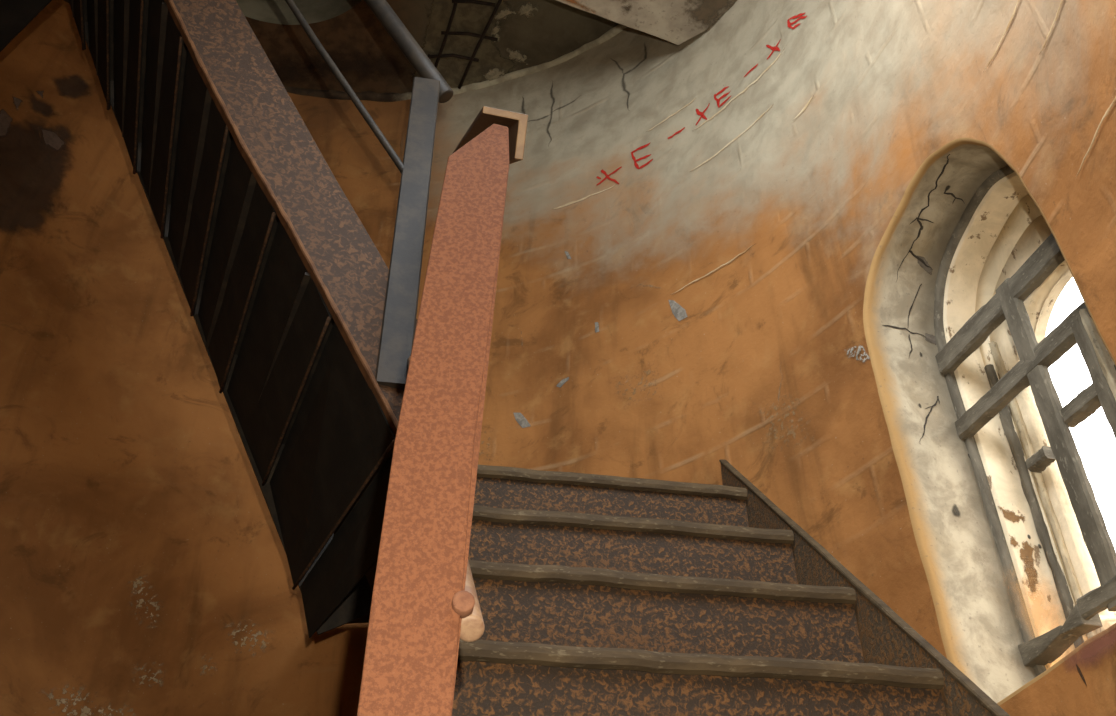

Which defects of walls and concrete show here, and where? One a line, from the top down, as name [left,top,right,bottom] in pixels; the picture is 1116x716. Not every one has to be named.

crack [613,47,646,107]
crack [522,84,575,136]
crack [882,154,965,356]
crack [920,396,940,440]
peeling [998,506,1041,593]